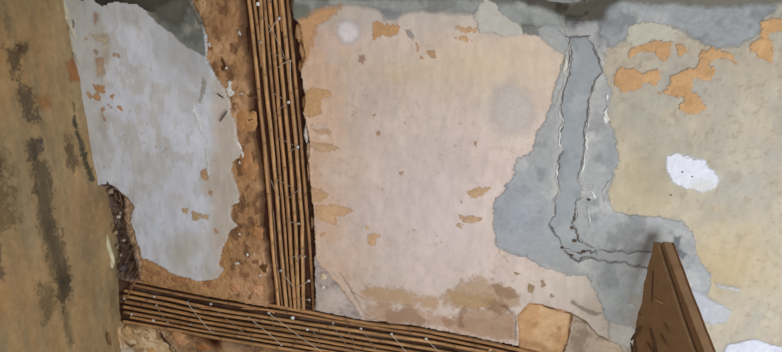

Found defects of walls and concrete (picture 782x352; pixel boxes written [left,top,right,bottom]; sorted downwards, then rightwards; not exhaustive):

leakage [68,62,80,81]
peeling [87,35,123,122]
peeling [295,4,341,72]
peeling [455,0,570,52]
peeling [614,21,738,114]
flaking render [140,0,281,307]
peeling [302,88,354,289]
crack [549,36,652,269]
leakage [57,267,71,302]
flaking render [118,322,300,352]
leakage [364,278,519,339]
flaking render [517,280,635,352]